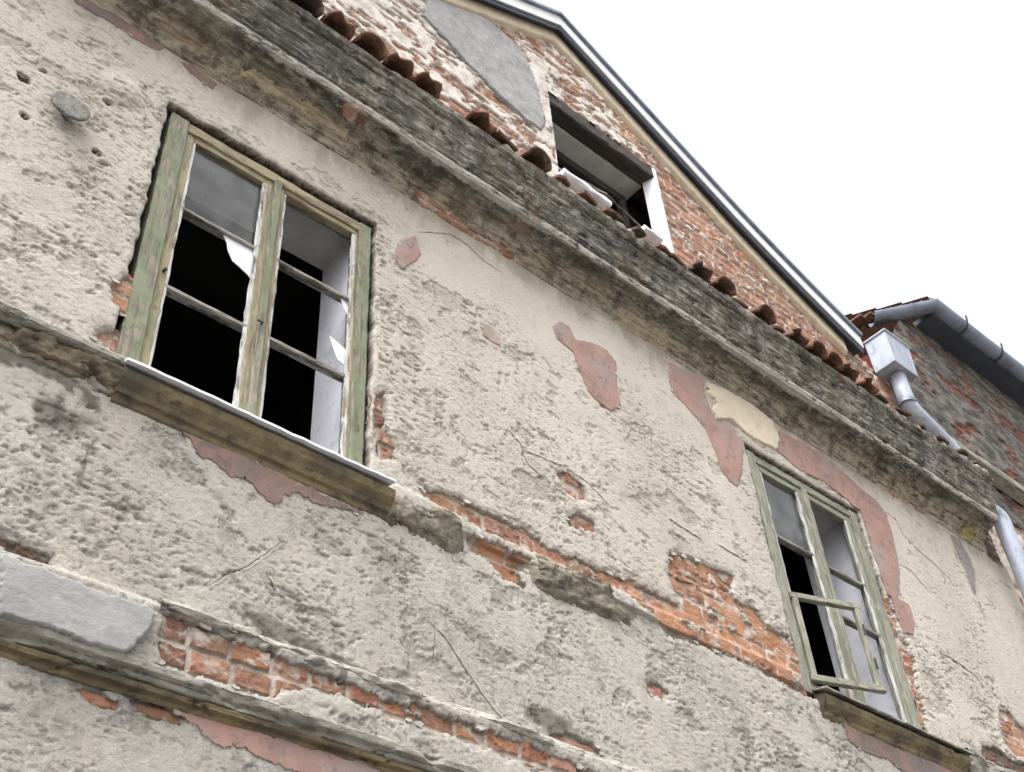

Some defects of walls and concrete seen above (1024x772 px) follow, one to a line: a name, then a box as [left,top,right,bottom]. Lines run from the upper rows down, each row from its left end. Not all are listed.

crack [419,230,501,271]
peeling [552,321,621,412]
peeling [667,362,744,487]
peeling [182,431,364,516]
flaking render [557,468,594,533]
crack [209,542,281,594]
flaking render [418,486,807,699]
peeling [777,431,929,727]
peeling [75,689,381,772]
flaking render [158,616,589,772]
crack [429,619,505,719]
flaking render [981,709,1024,772]